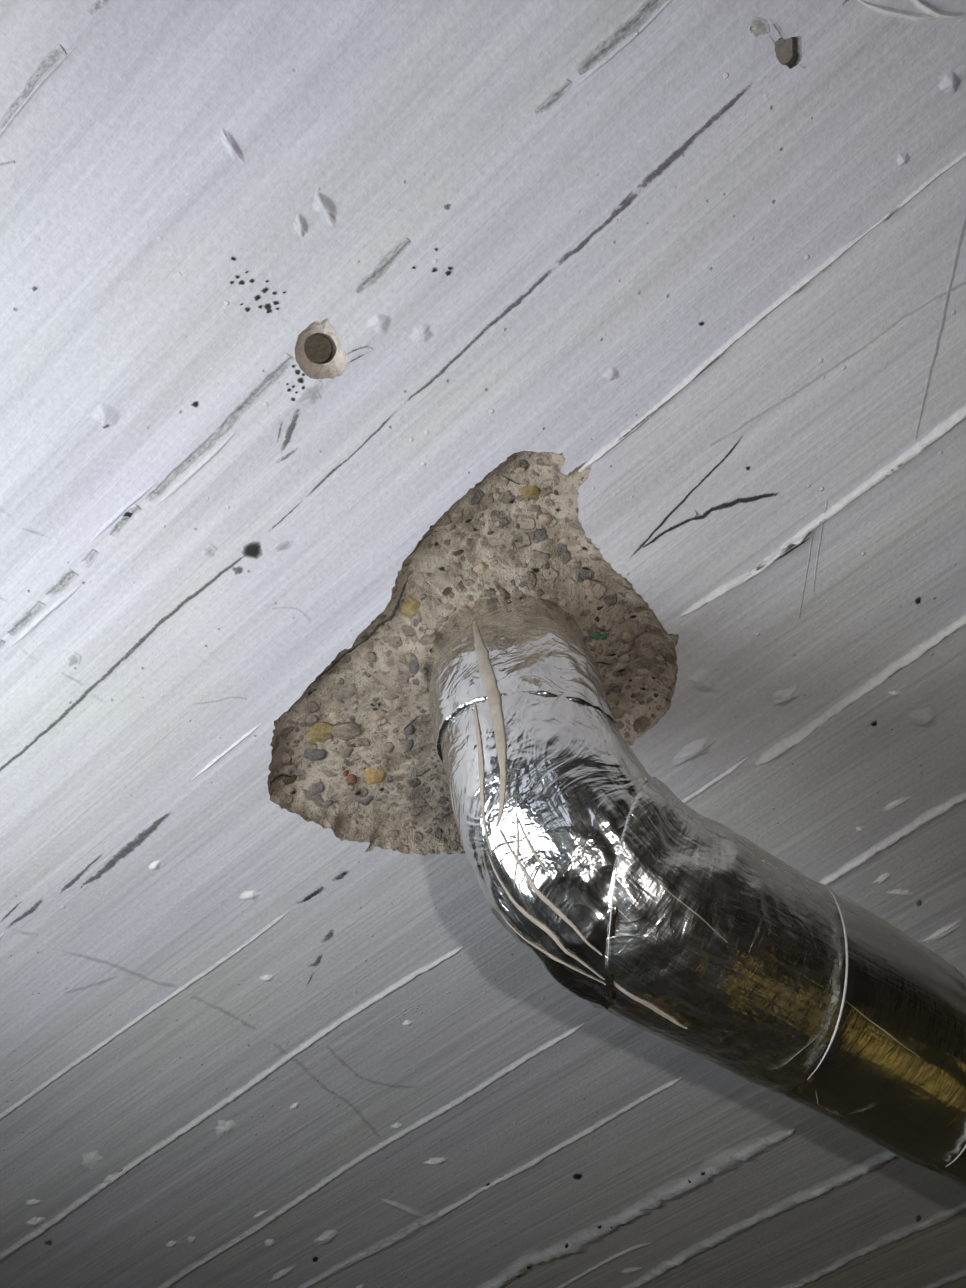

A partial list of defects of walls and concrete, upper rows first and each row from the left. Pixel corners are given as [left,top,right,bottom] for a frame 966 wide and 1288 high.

crack [272,90,746,529]
crack [704,214,966,476]
crack [0,557,247,771]
spalling [267,451,679,856]